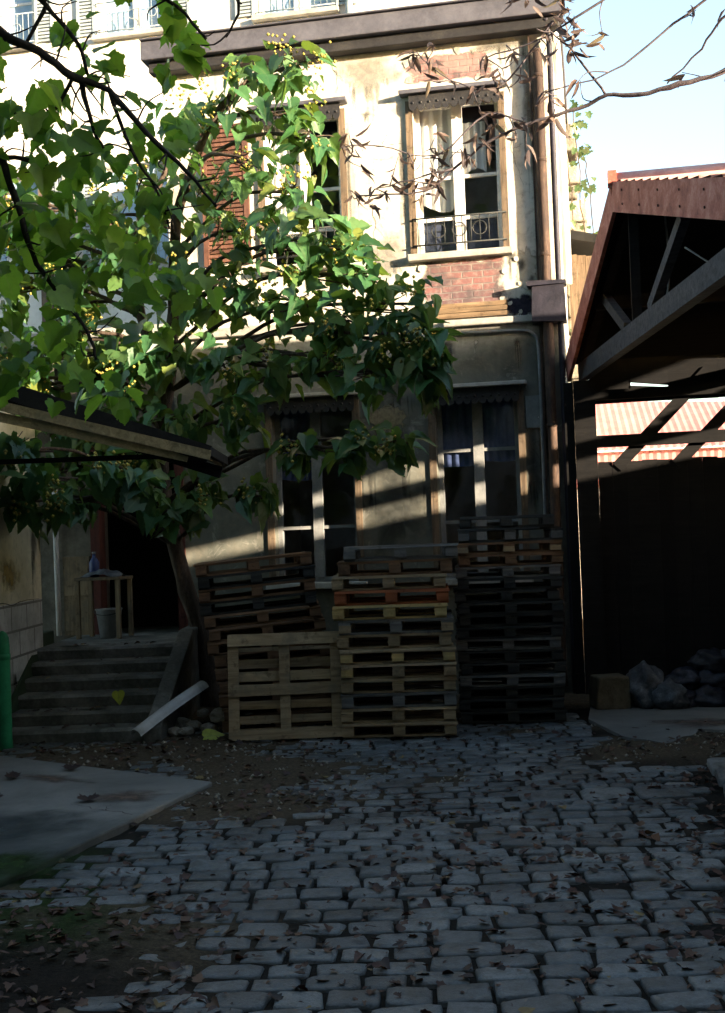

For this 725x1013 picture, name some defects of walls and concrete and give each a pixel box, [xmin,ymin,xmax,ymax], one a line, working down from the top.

flaking render [403,46,492,84]
flaking render [418,247,537,313]